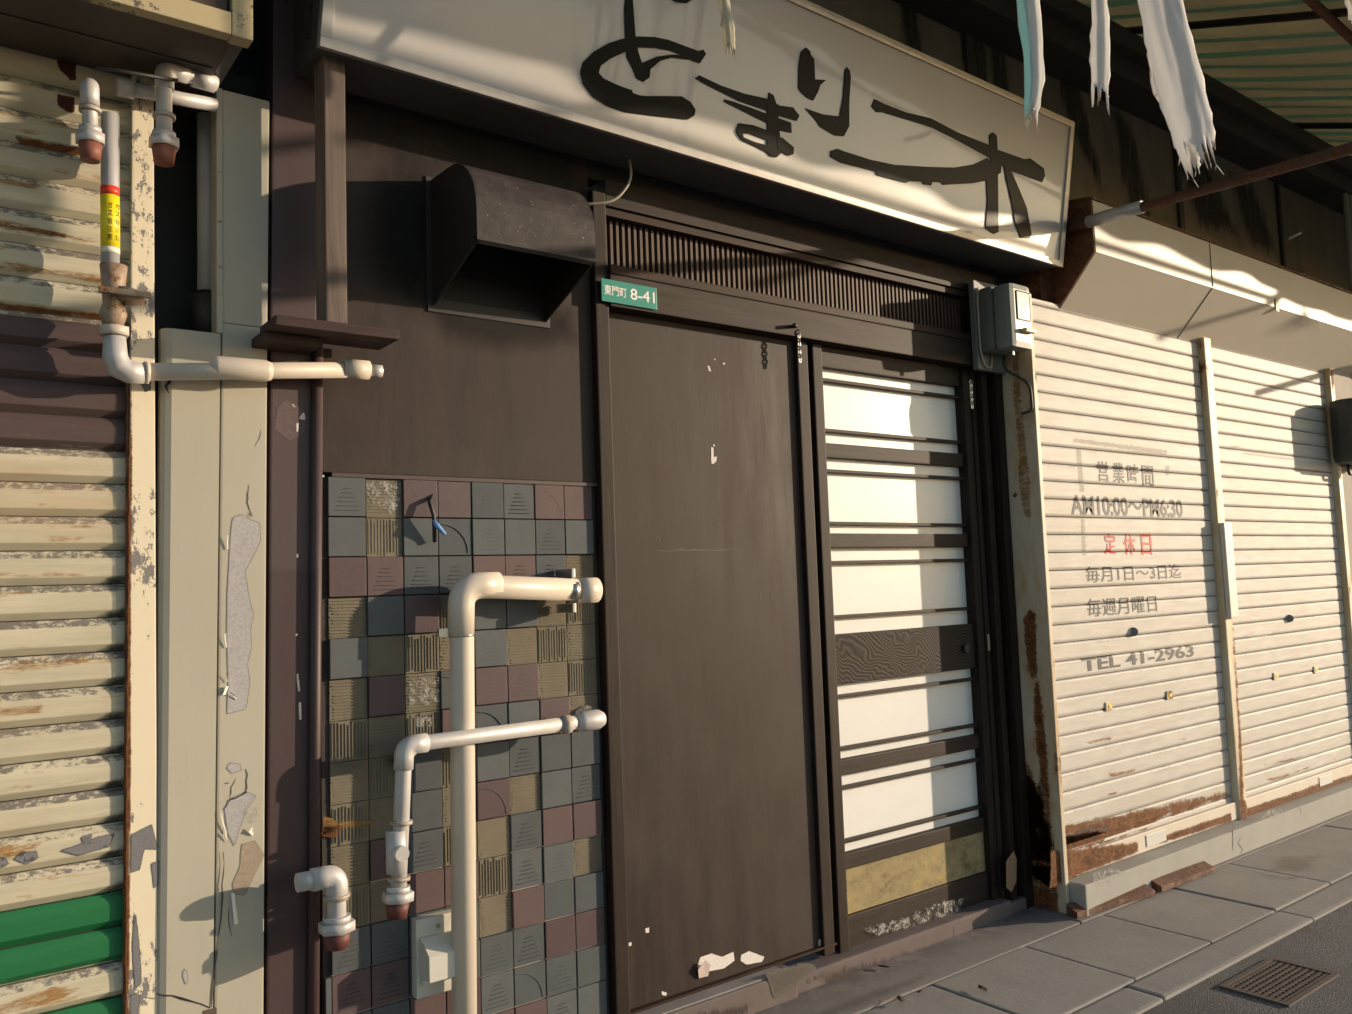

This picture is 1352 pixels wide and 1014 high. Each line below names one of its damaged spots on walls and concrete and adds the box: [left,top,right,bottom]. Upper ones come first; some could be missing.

corrosion [16,136,80,156]
corrosion [0,221,71,238]
corrosion [5,262,101,282]
corrosion [0,303,101,320]
peeling [223,514,261,714]
corrosion [1023,610,1352,919]
flaking render [220,791,264,936]
corrosion [0,987,72,1011]